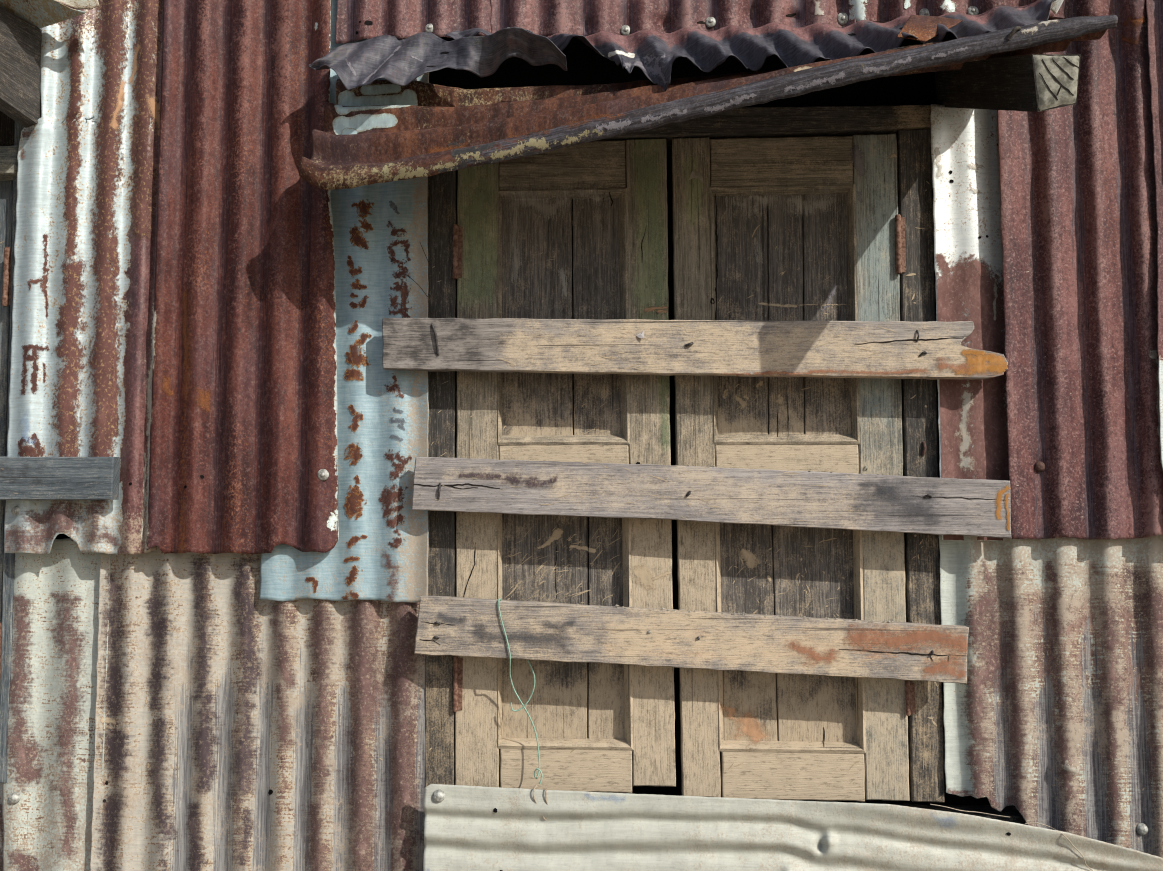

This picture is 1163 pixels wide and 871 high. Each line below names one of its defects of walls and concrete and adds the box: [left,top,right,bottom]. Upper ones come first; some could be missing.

peeling [849,0,867,21]
peeling [940,0,957,12]
rust [18,0,163,457]
rust [343,199,374,381]
rust [935,251,1005,356]
rust [939,371,1009,481]
rust [7,593,86,858]
rust [98,573,132,871]
rust [146,558,220,871]
rust [232,558,296,795]
rust [305,404,424,871]
rust [948,561,1028,818]